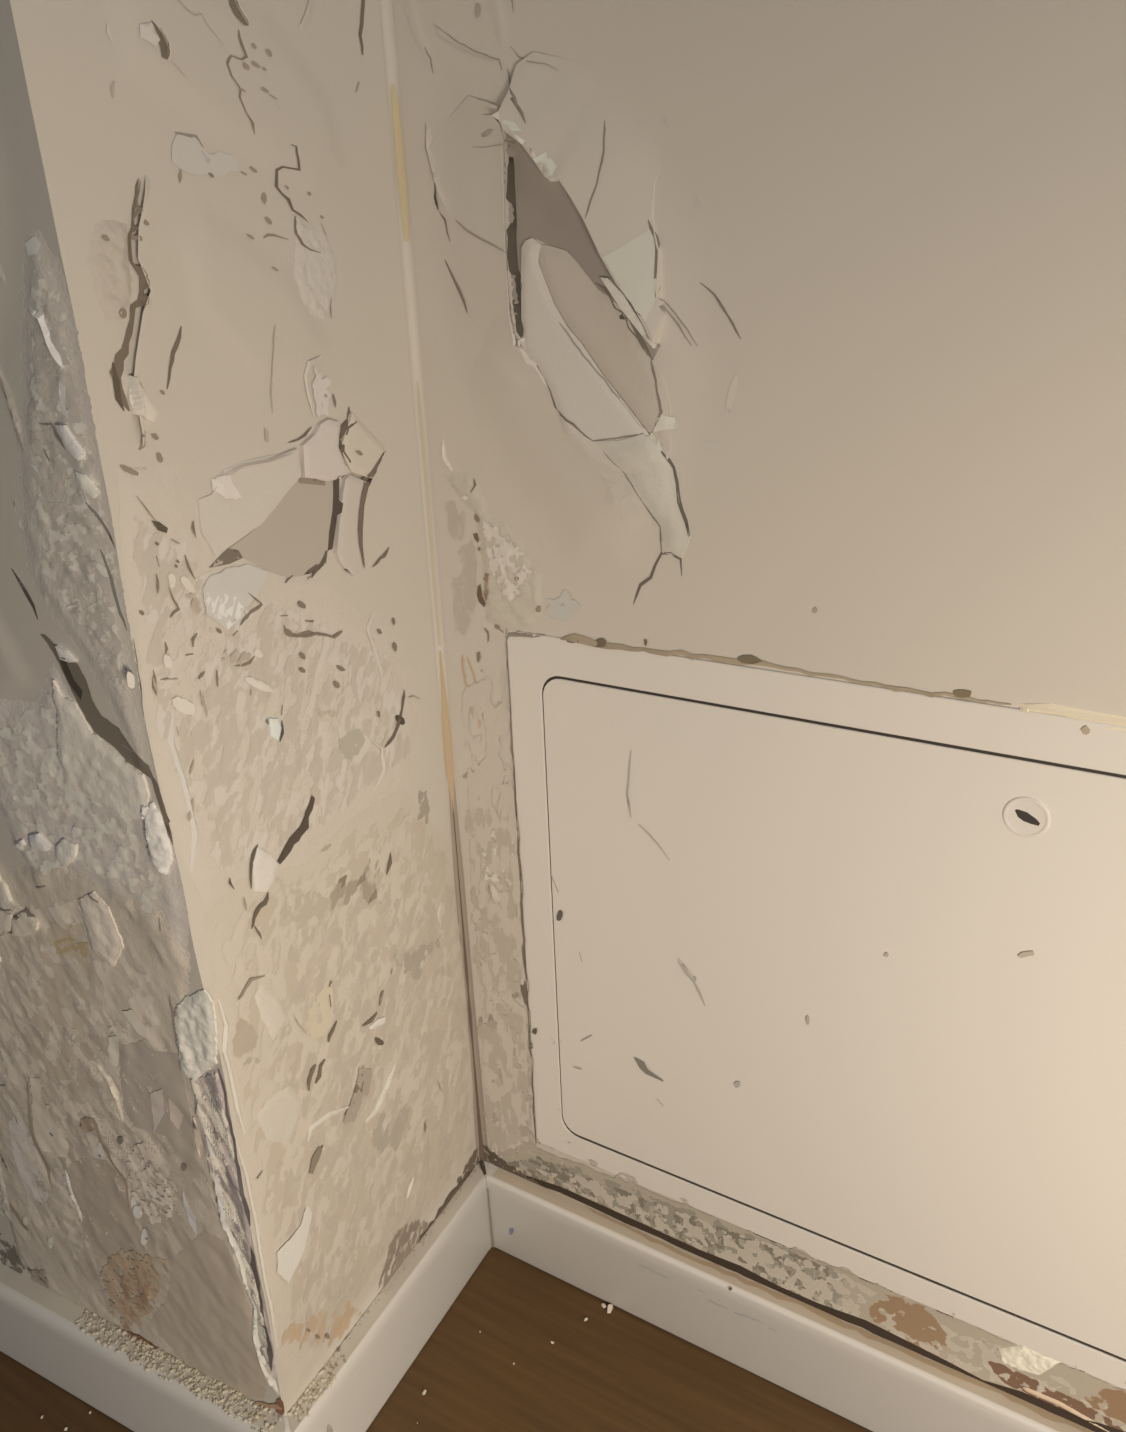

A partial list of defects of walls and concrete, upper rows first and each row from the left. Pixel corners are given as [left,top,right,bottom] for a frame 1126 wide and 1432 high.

crack [110,179,150,450]
crack [263,144,326,253]
peeling [425,52,691,558]
crack [424,0,698,605]
crack [0,377,389,845]
peeling [441,440,543,634]
peeling [0,215,493,1402]
crack [229,796,315,939]
crack [293,981,384,1091]
crack [366,625,1125,1432]
crack [218,1069,273,1372]
peeling [997,1344,1061,1375]